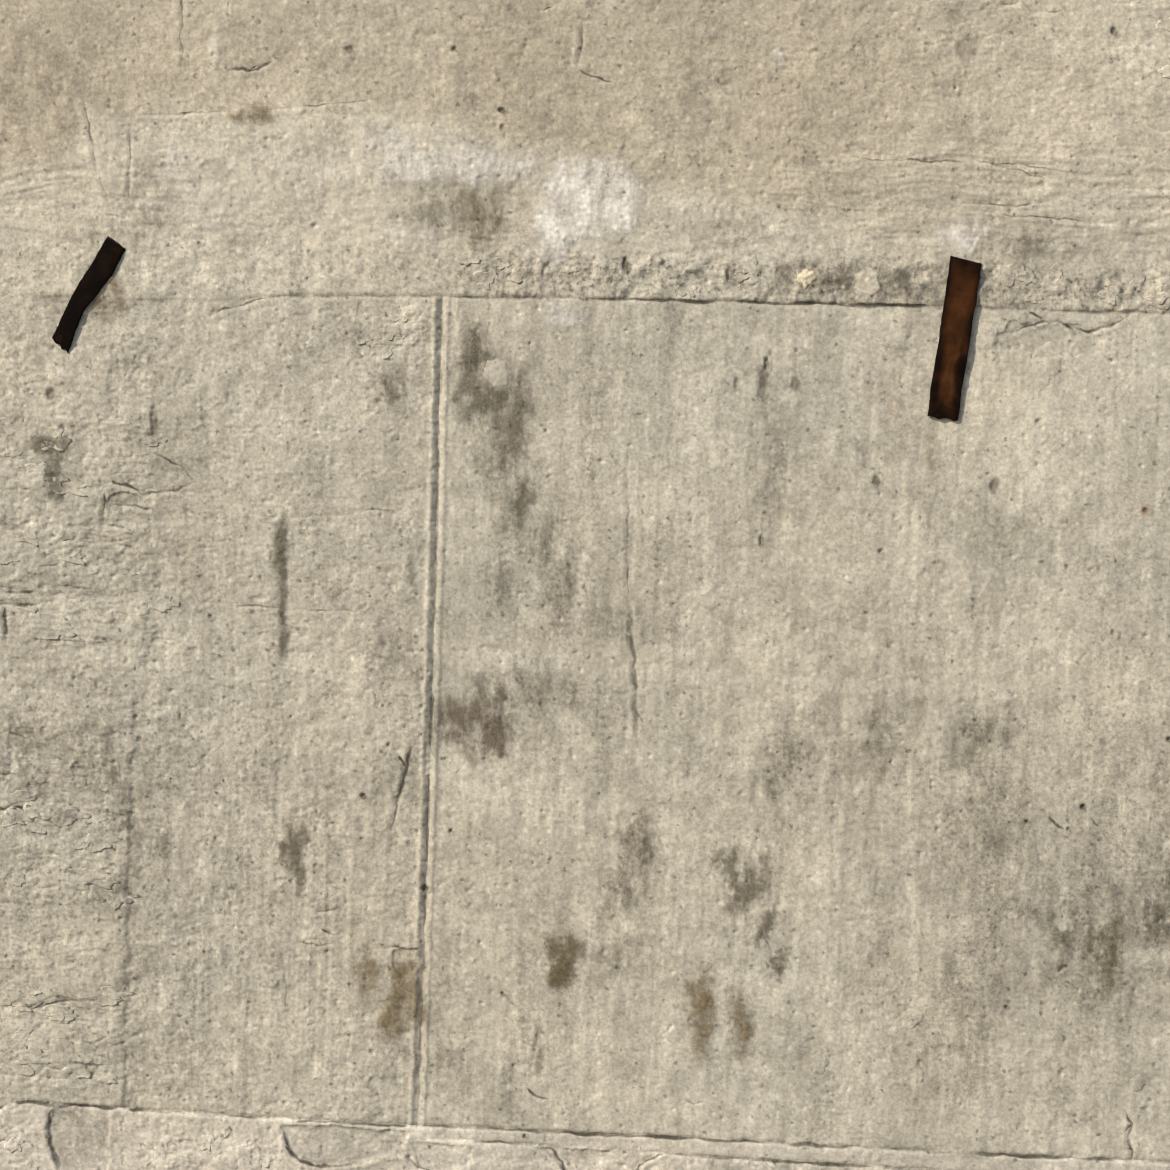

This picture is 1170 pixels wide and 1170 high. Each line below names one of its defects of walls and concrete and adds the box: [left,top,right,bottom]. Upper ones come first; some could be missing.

corrosion [941,272,974,398]
leakage [454,331,532,465]
leakage [514,483,535,520]
leakage [274,520,288,652]
leakage [469,651,535,673]
leakage [435,688,509,757]
leakage [715,850,766,910]
leakage [756,911,774,941]
leakage [1147,906,1169,937]